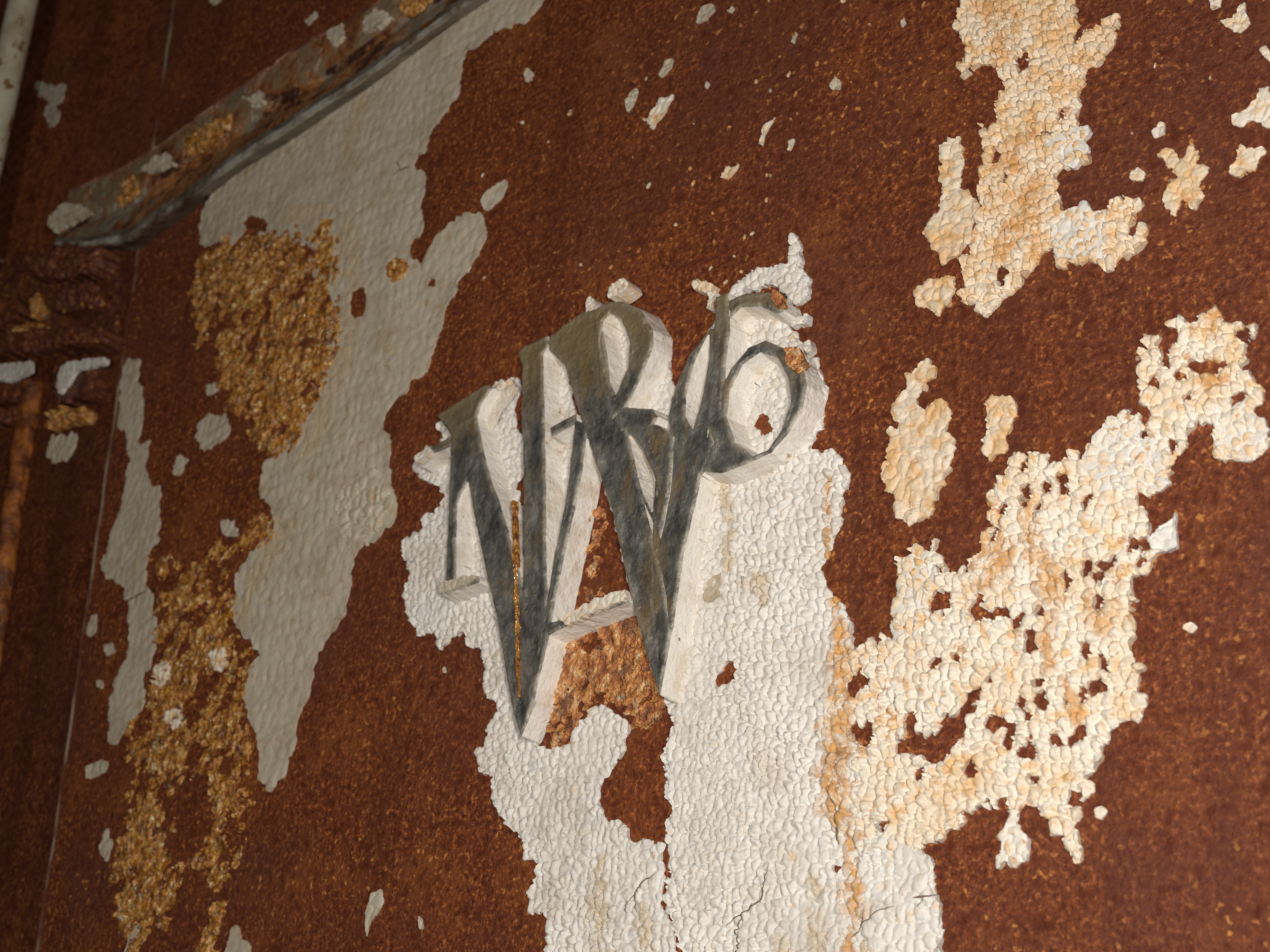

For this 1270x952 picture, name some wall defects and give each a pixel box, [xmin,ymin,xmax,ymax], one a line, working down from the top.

peeling [901,0,1149,318]
peeling [1209,0,1251,33]
corrosion [0,379,43,667]
peeling [56,357,162,745]
corrosion [108,510,275,952]
corrosion [187,219,345,460]
peeling [195,0,544,792]
corrosion [546,616,666,748]
crack [624,872,655,913]
crack [726,862,770,952]
peeling [401,233,1270,952]
corrosion [817,596,870,952]